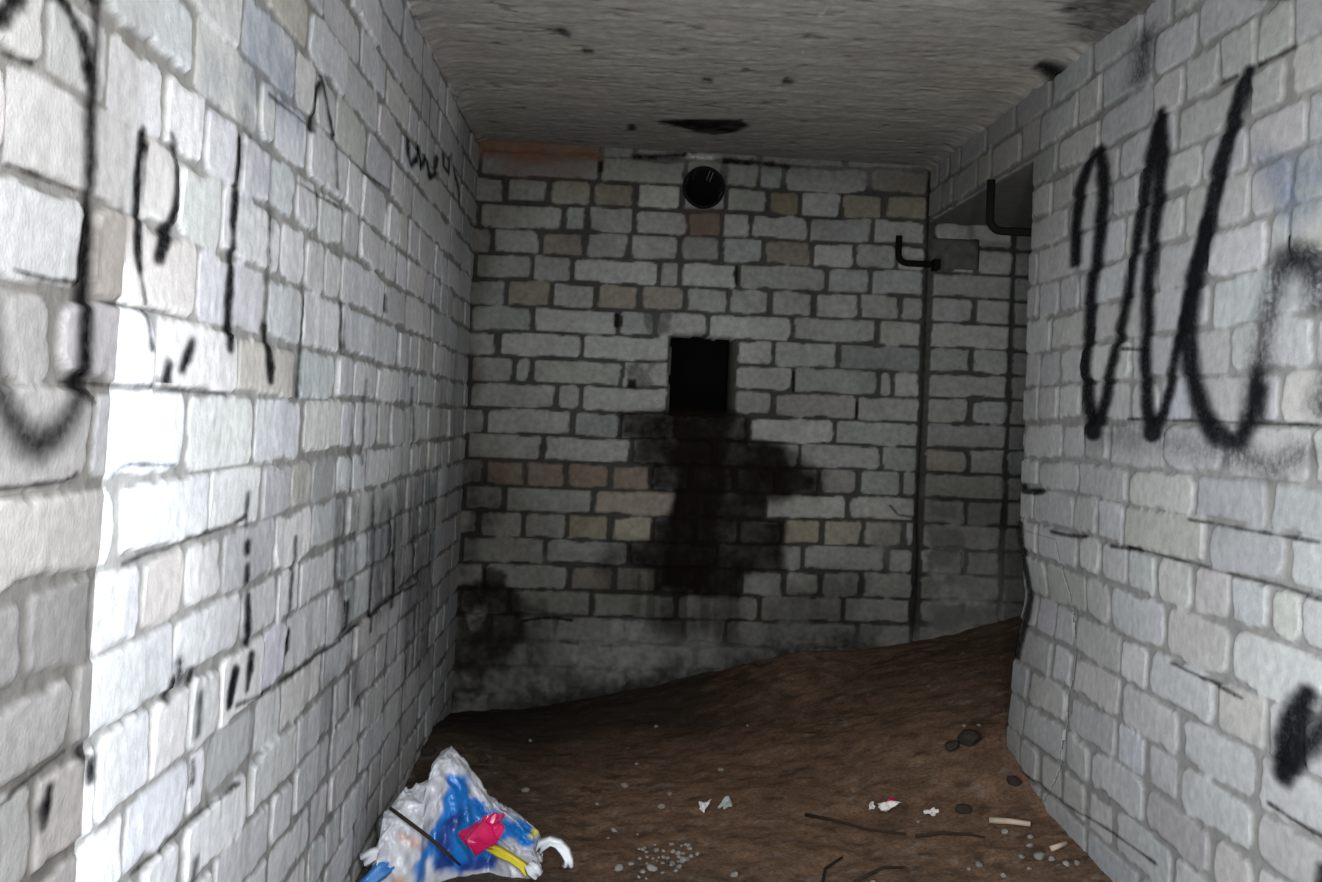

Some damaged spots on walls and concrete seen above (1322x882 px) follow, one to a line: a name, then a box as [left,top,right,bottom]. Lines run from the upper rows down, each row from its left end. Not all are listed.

water stain [667,414,731,600]